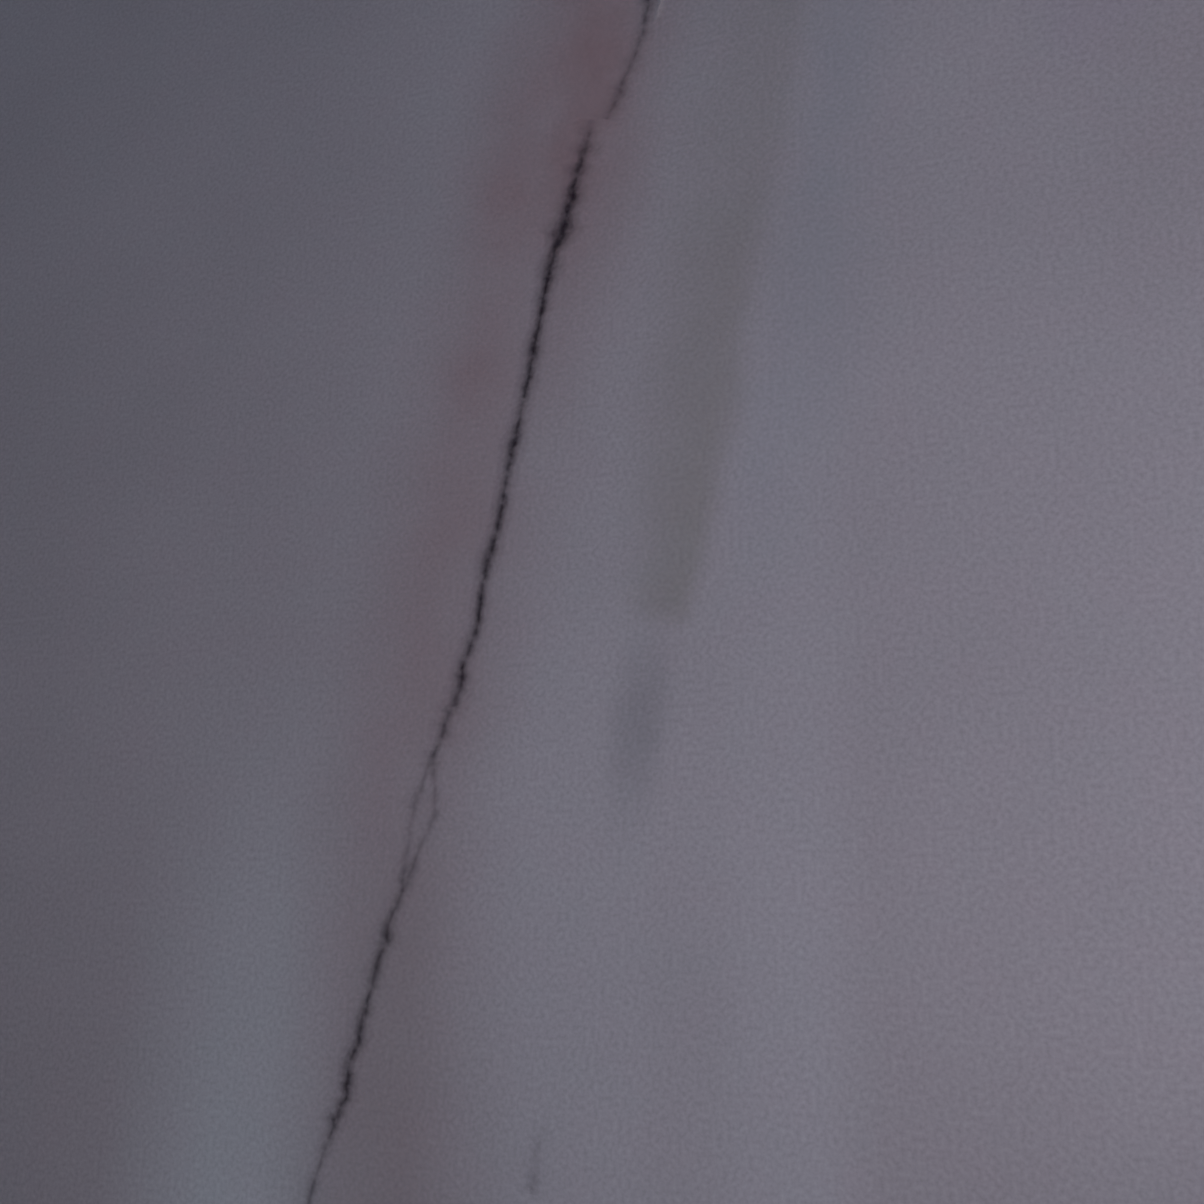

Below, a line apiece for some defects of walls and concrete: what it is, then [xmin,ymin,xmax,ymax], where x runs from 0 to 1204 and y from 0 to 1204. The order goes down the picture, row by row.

crack [442,148,586,734]
crack [331,927,389,1133]